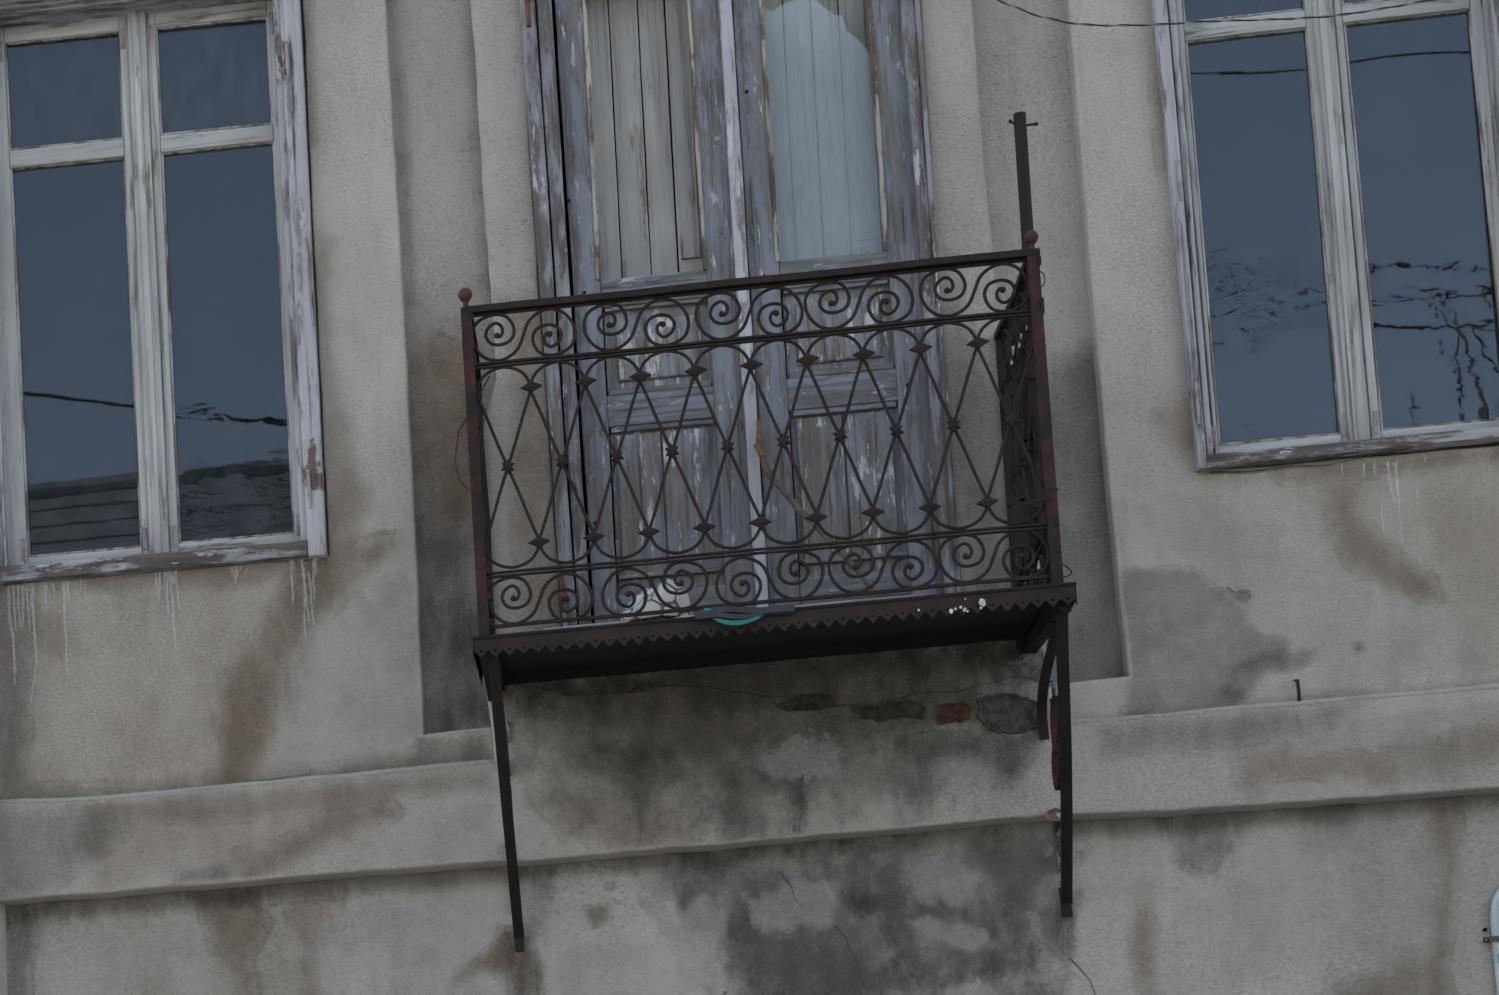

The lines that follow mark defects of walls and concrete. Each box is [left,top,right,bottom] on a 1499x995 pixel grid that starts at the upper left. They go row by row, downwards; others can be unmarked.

spalling [778,653,1048,735]